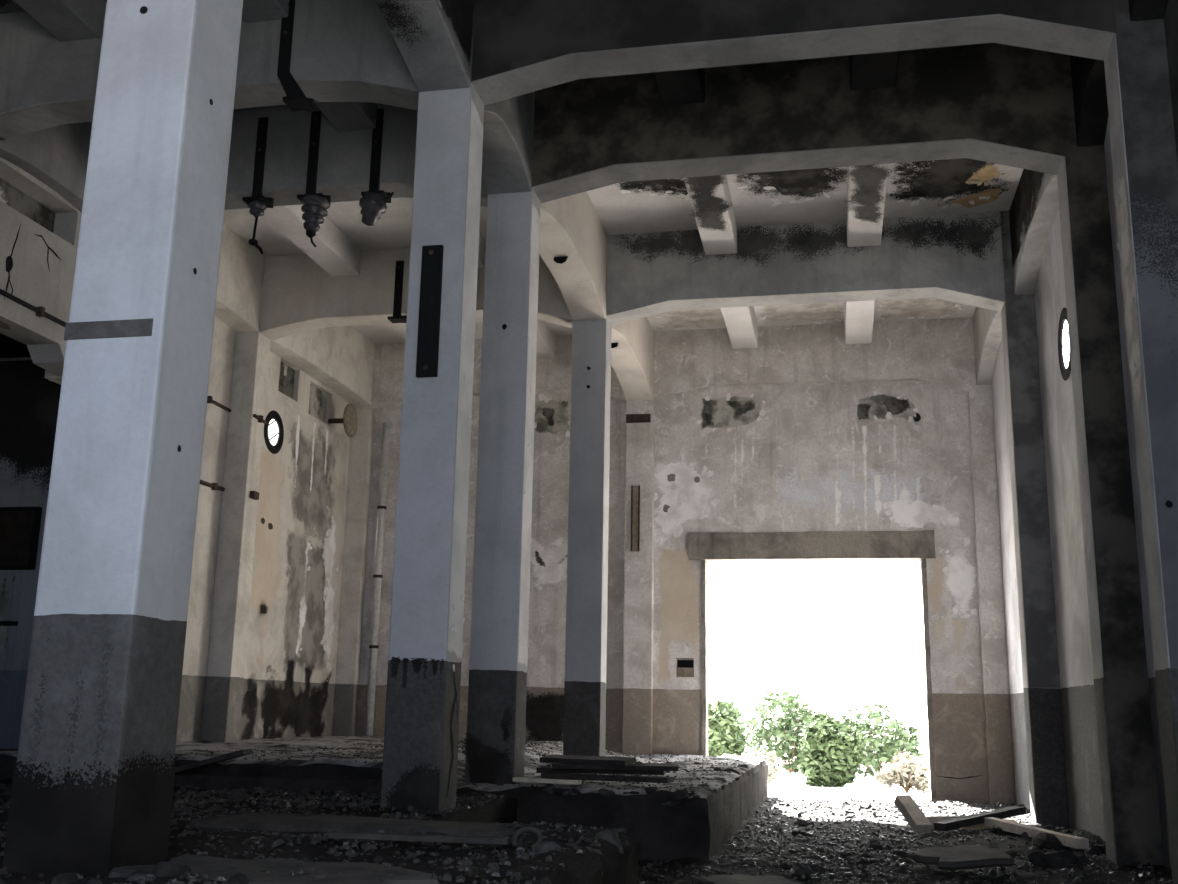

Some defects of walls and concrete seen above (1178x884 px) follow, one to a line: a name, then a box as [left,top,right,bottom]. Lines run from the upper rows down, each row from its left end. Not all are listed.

leakage [1164,0,1178,162]
peeling [620,189,689,201]
peeling [763,186,840,207]
leakage [241,415,340,740]
peeling [518,203,570,667]
peeling [654,393,766,547]
spalling [851,391,978,618]